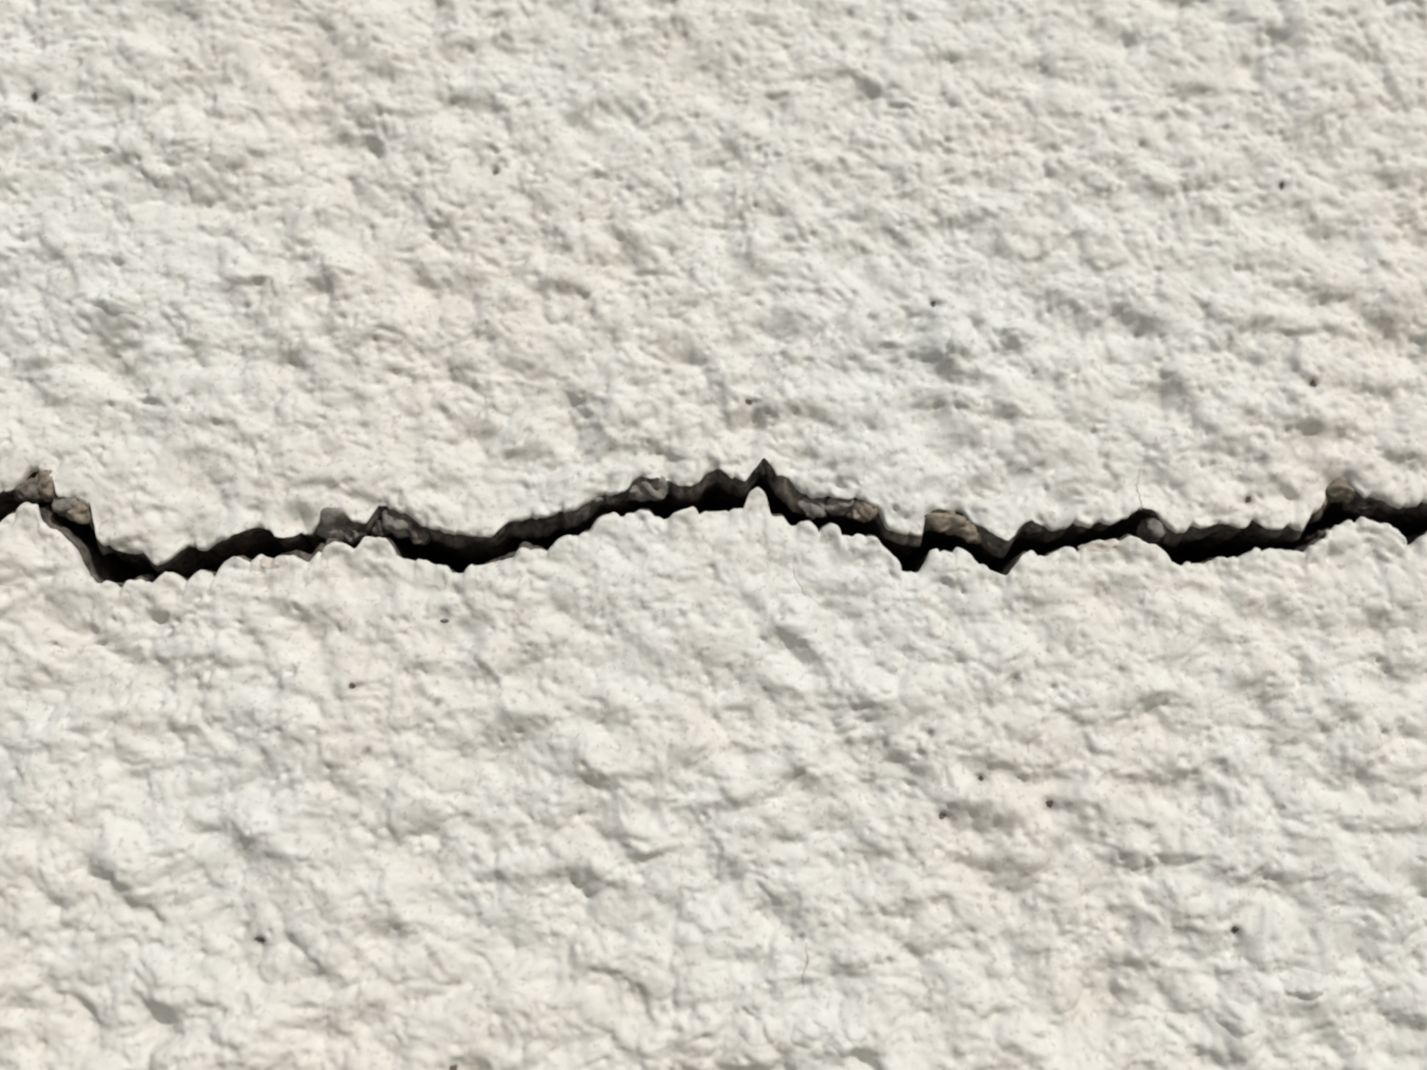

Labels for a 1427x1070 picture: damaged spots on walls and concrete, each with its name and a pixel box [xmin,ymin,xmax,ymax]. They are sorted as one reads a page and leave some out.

crack [0,458,1427,587]